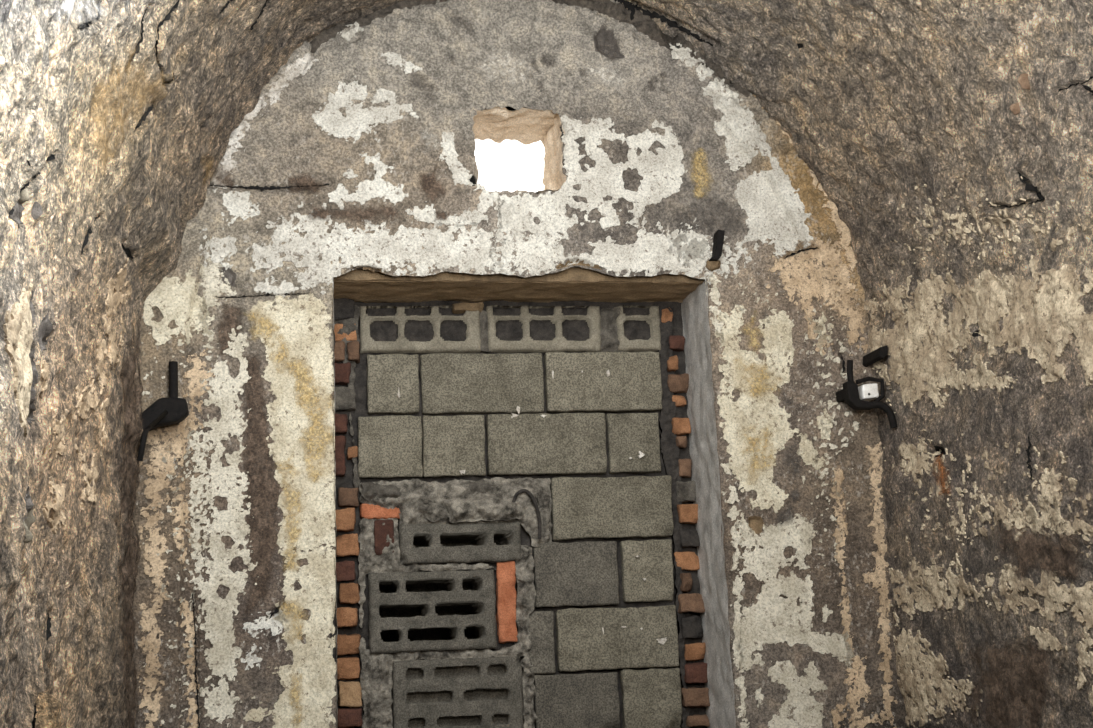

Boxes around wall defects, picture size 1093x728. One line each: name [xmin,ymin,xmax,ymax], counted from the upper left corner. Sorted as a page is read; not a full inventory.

crack [78,0,102,29]
crack [250,0,267,30]
crack [615,0,713,46]
crack [125,0,180,129]
crack [1058,76,1093,96]
crack [210,183,329,191]
crack [989,172,1044,208]
peeling [240,0,1093,728]
peeling [137,228,262,728]
water stain [996,526,1081,579]
water stain [969,641,1050,728]